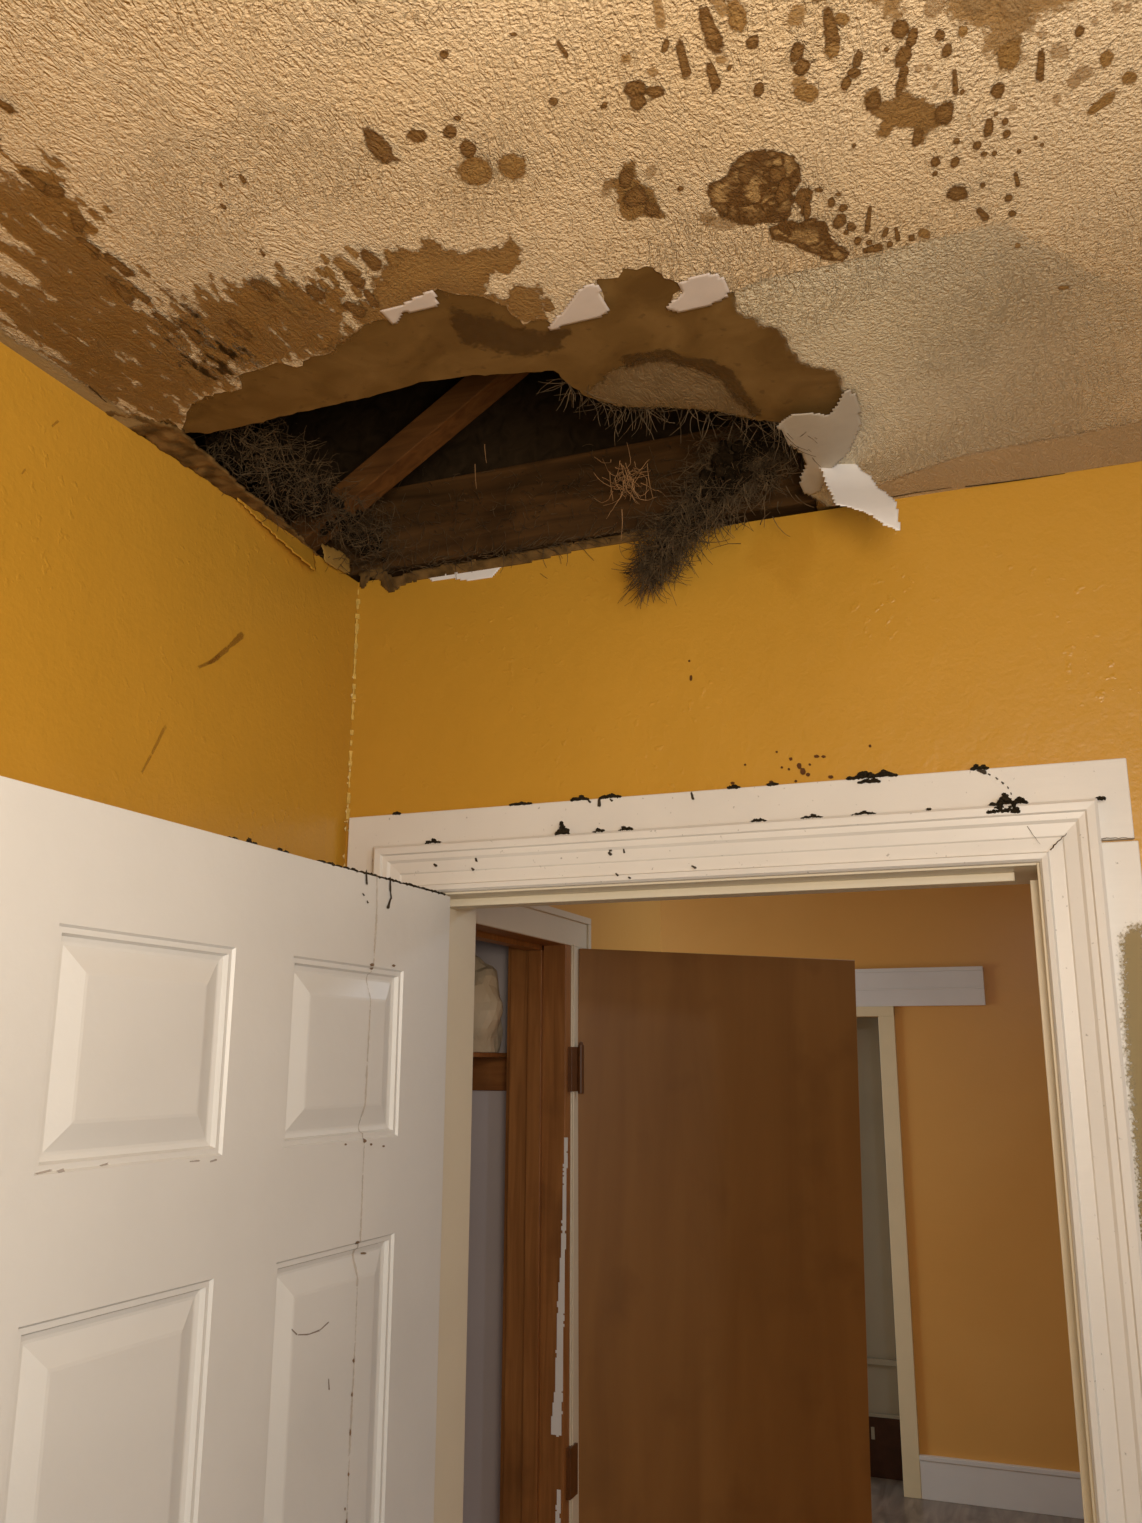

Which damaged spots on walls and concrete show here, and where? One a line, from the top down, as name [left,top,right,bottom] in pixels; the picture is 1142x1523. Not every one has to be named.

leakage [624,0,759,110]
leakage [753,82,764,97]
leakage [788,0,1074,176]
leakage [1075,19,1099,38]
leakage [1053,50,1137,115]
leakage [362,126,400,164]
leakage [406,115,527,185]
leakage [605,161,666,221]
leakage [700,149,930,262]
leakage [946,182,990,221]
leakage [1005,172,1021,217]
spalling [105,266,900,832]